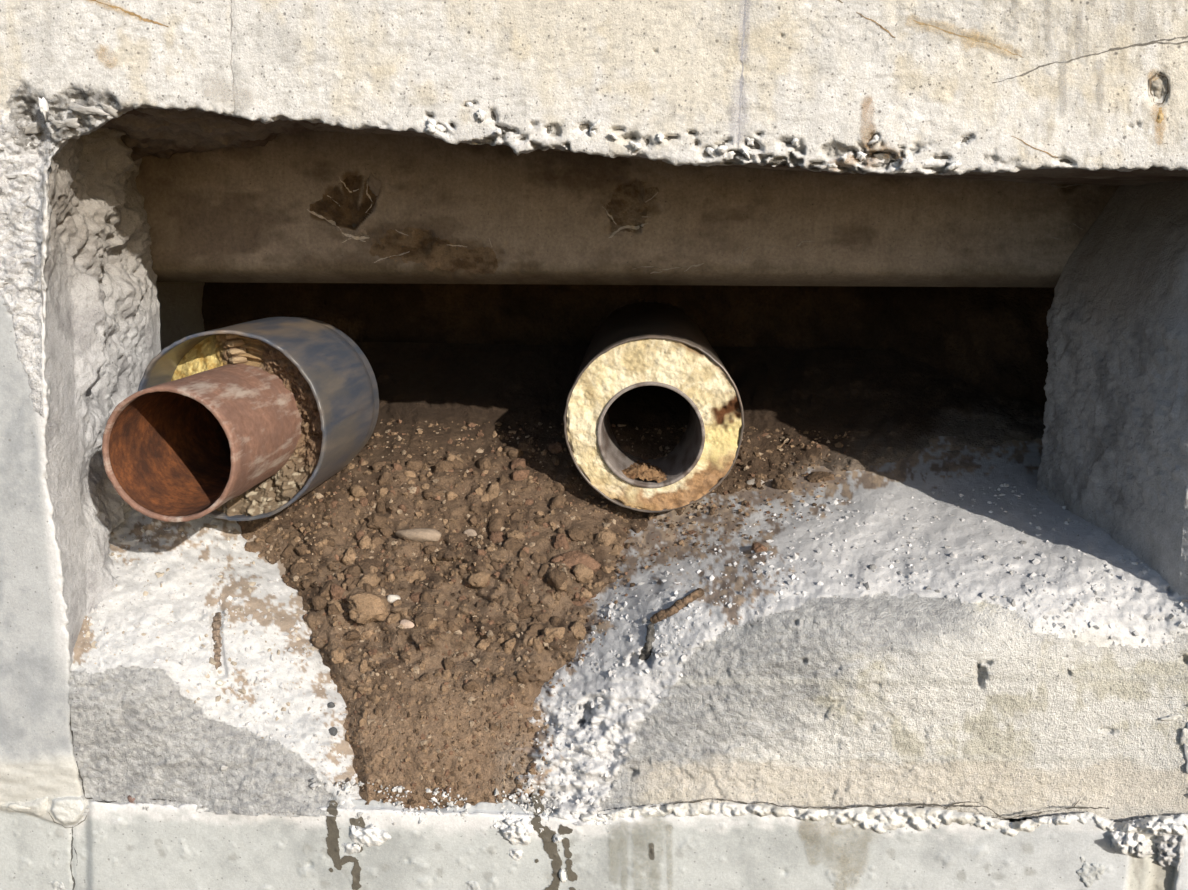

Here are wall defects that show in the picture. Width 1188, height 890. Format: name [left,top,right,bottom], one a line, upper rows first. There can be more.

crack [838,0,1188,83]
crack [737,2,746,151]
spalling [425,115,454,133]
spalling [465,102,526,141]
spalling [579,120,761,161]
spalling [765,138,799,164]
spalling [810,134,913,171]
spalling [934,156,961,171]
spalling [307,173,499,274]
spalling [0,85,125,418]
rust [638,588,705,660]
crack [597,797,1109,820]